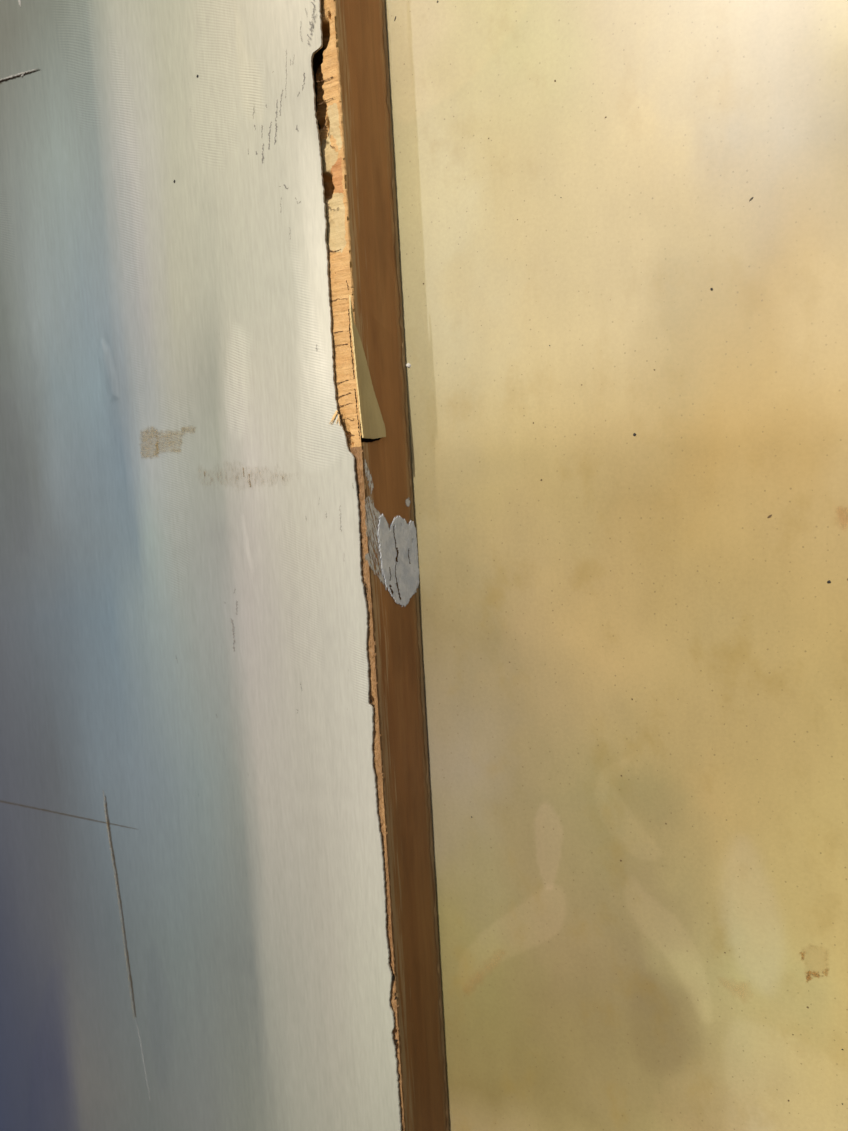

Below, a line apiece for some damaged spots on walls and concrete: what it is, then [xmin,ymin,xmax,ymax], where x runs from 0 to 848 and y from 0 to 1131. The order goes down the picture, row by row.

spalling [316,0,364,447]